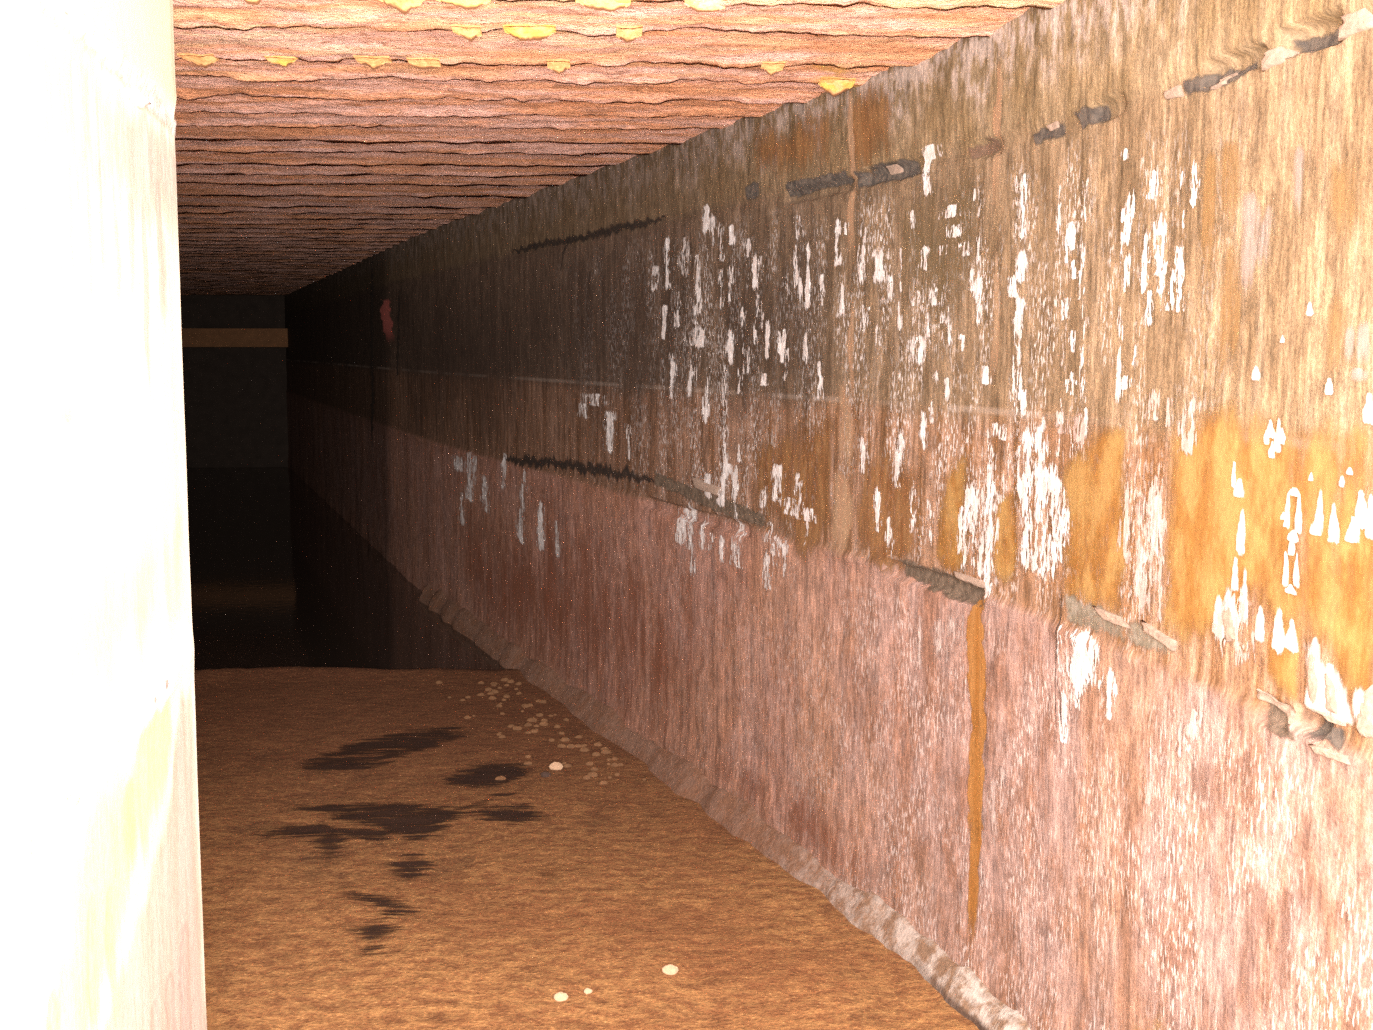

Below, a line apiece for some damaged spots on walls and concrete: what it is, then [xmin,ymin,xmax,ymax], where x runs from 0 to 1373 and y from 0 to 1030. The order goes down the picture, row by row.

crack [0,617,191,858]
water stain [255,763,552,880]
crack [504,454,654,483]
water stain [651,204,869,589]
water stain [783,184,985,558]
rust [966,593,987,931]
efflorescence [955,174,1092,598]
crack [1054,588,1062,721]
efflorescence [1056,625,1118,744]
efflorescence [1117,476,1170,623]
efflorescence [1115,161,1200,403]
water stain [1212,462,1373,654]